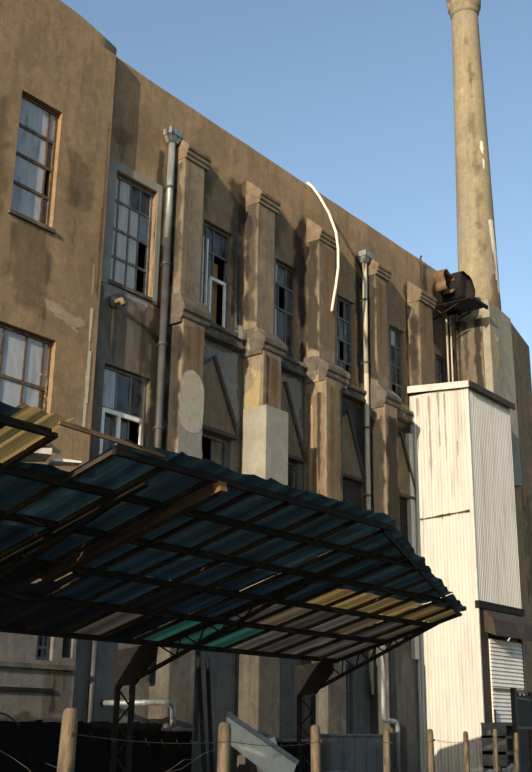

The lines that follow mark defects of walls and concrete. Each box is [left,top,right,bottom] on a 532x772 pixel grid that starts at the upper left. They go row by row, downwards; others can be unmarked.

leakage [231,194,252,325]
leakage [300,257,318,343]
peeling [488,219,500,294]
leakage [449,322,469,381]